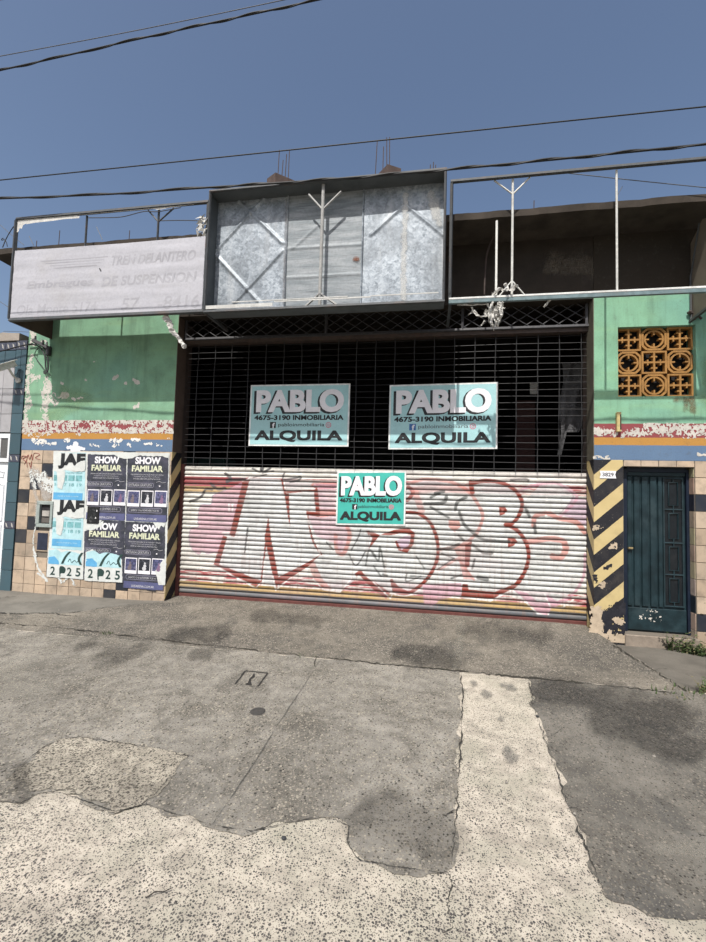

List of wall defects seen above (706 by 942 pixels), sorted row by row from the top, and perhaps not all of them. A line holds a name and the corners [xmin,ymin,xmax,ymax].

peeling [22,331,174,448]
peeling [594,423,706,439]
peeling [589,602,626,643]